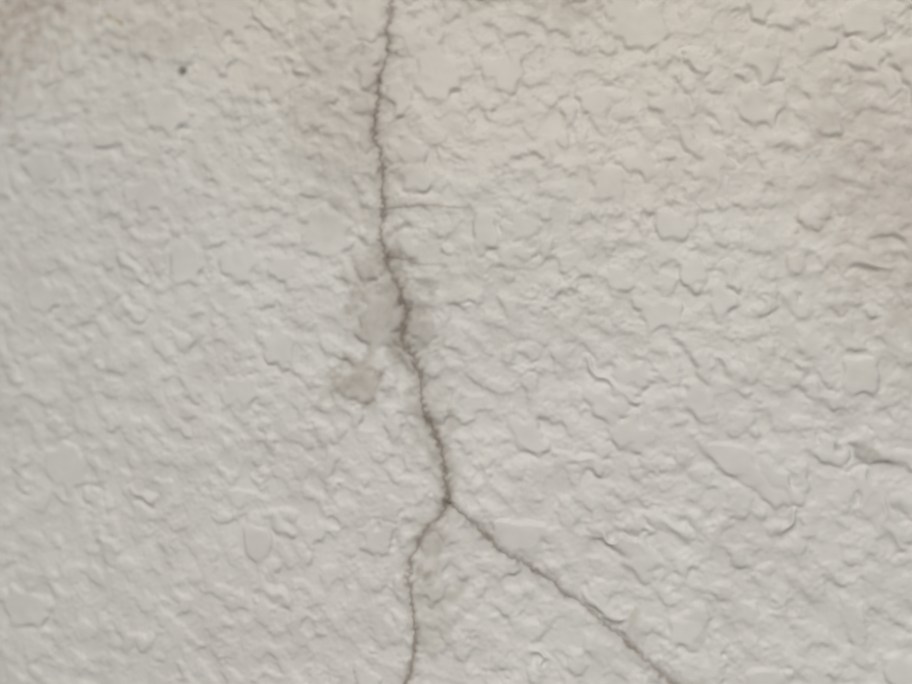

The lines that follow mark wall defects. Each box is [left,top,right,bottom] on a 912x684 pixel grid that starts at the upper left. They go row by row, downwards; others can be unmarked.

crack [372,72,382,137]
crack [399,289,418,361]
crack [421,399,442,451]